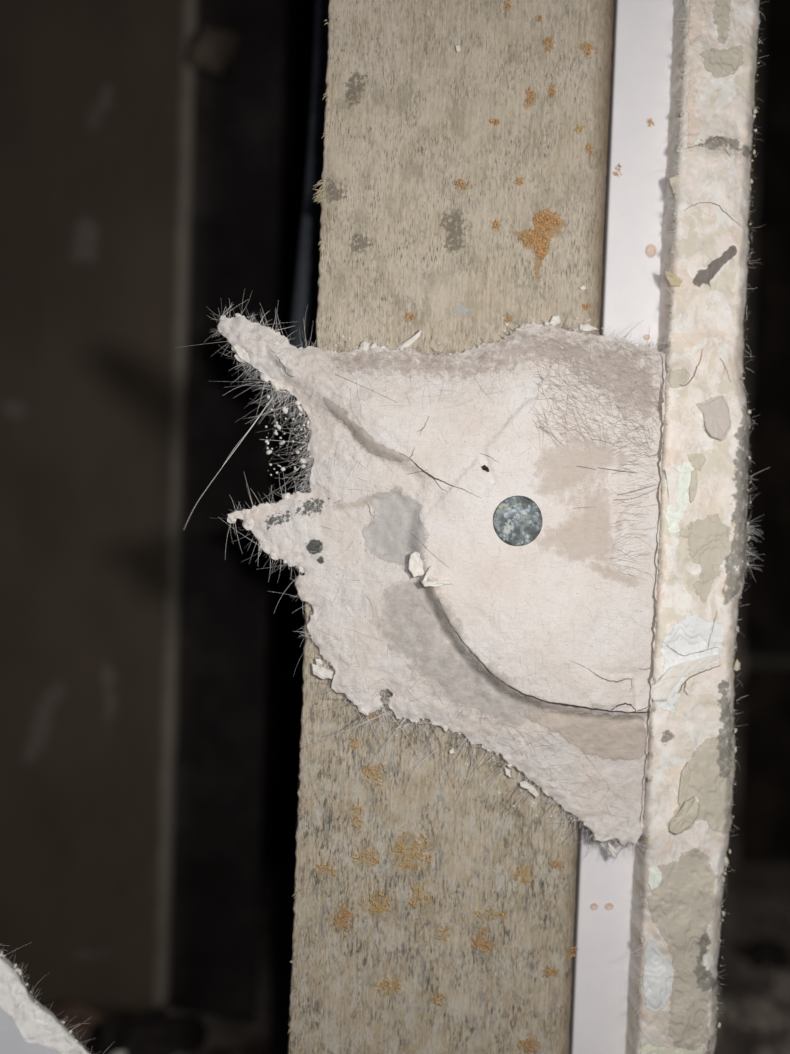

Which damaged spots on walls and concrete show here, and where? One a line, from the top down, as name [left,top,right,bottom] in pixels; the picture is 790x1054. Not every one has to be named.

rust [514,209,564,279]
spalling [323,398,410,461]
peeling [696,395,731,440]
spalling [265,498,330,530]
spalling [306,539,324,564]
spalling [362,487,542,724]
crack [438,349,731,822]
peeling [664,454,732,603]
peeling [651,614,725,713]
peeling [668,737,733,835]
flaking render [0,943,109,1054]
peeling [640,849,717,1054]